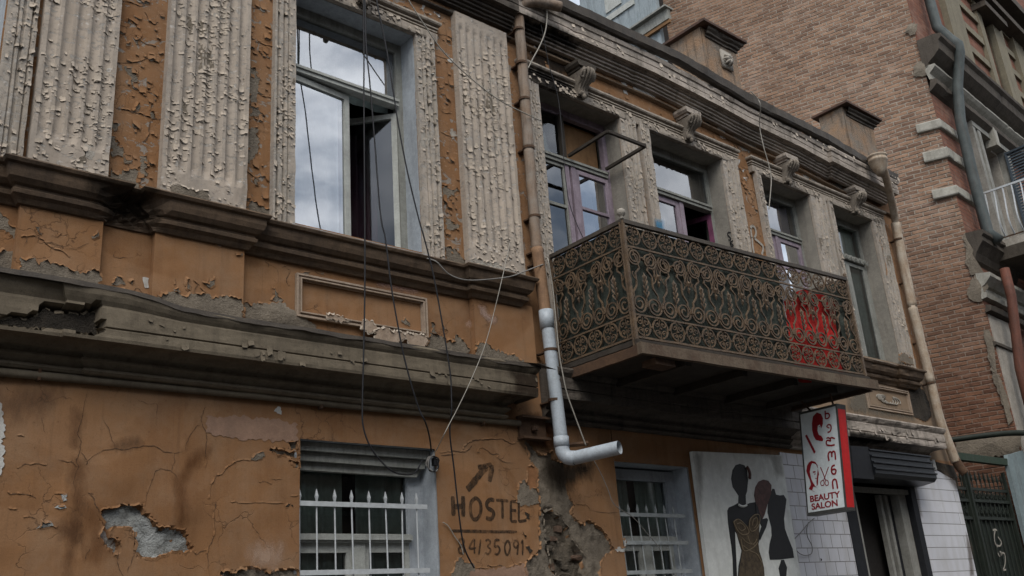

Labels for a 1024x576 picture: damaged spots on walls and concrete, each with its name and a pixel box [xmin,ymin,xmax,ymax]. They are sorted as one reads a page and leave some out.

spalling [0,308,98,335]
peeling [0,208,246,317]
peeling [0,0,296,223]
peeling [351,2,524,275]
peeling [528,61,779,285]
spalling [97,502,193,561]
crack [7,390,299,569]
spalling [515,440,627,576]